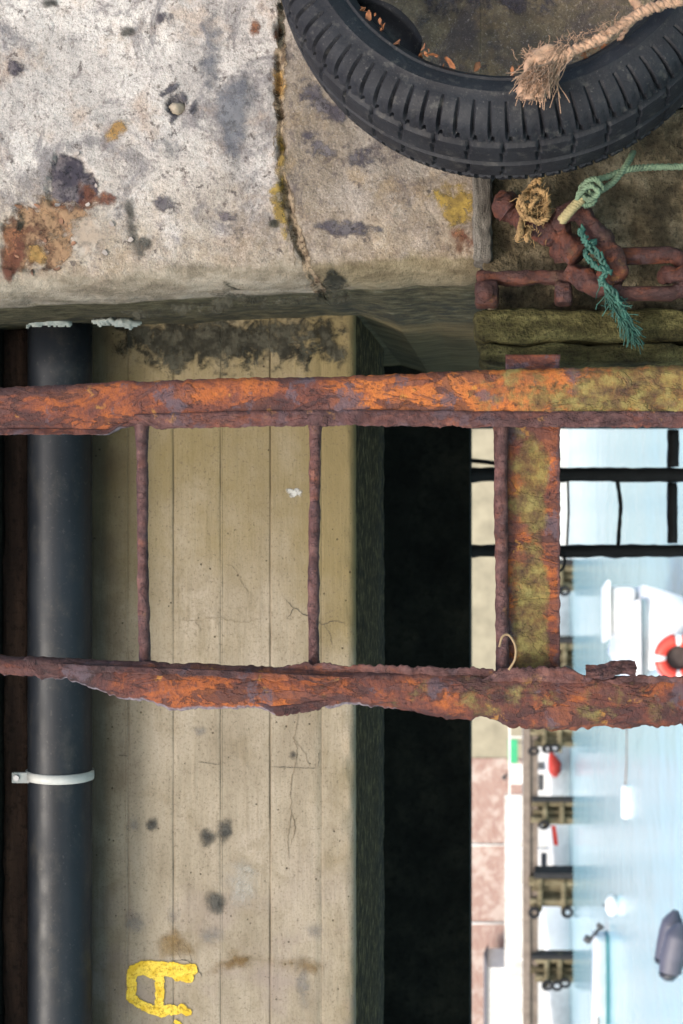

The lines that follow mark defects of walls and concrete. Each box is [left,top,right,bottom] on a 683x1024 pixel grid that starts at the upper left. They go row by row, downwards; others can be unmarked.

crack [272,3,328,304]
rust [51,186,116,210]
rust [1,228,46,282]
damp [115,269,349,375]
crack [279,714,319,856]
damp [201,823,232,846]
damp [208,894,224,914]